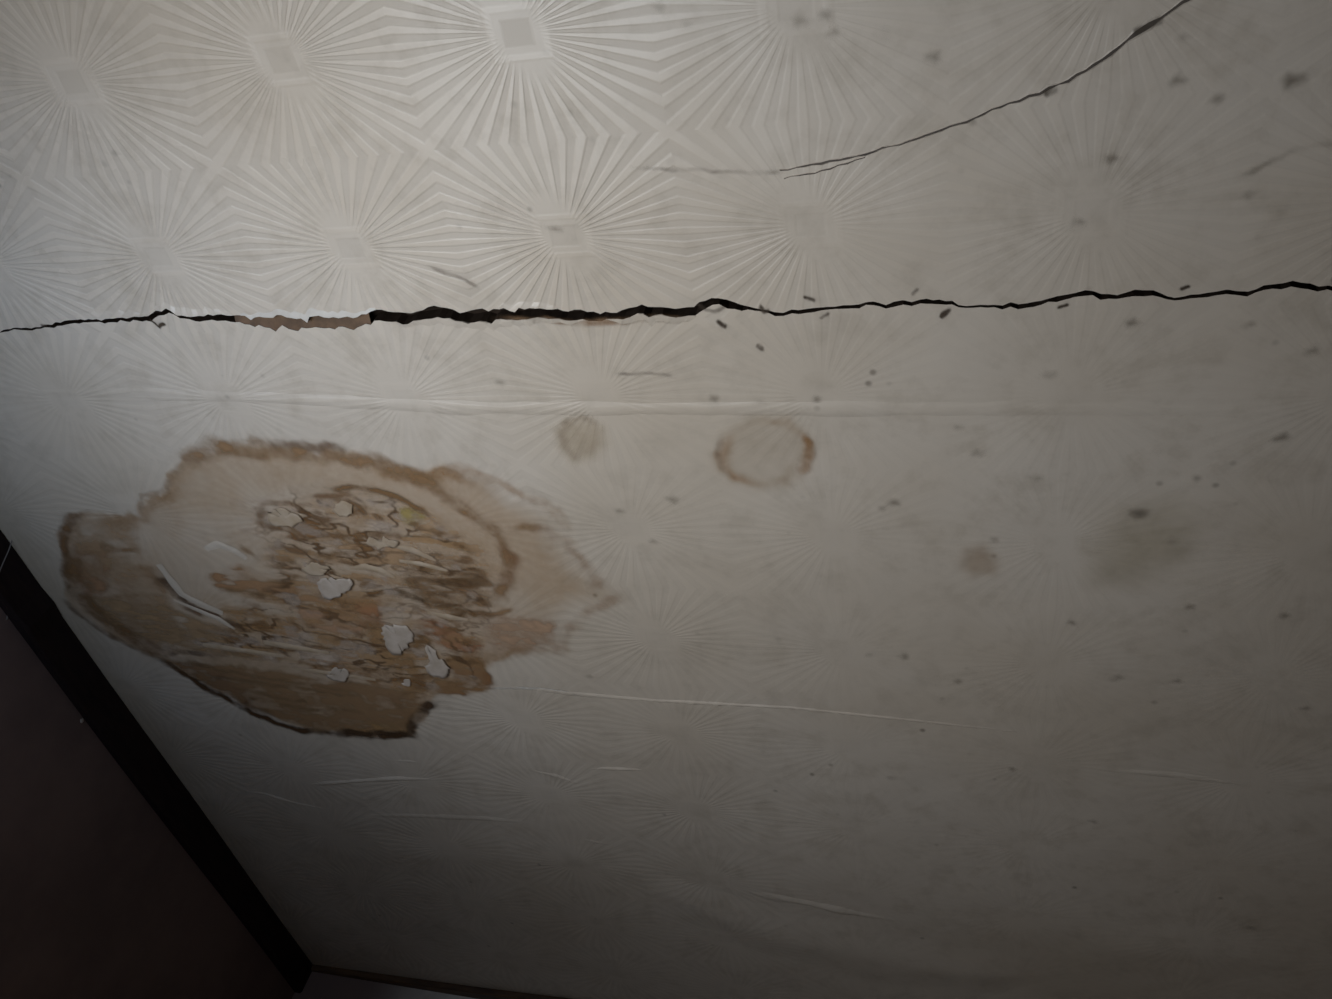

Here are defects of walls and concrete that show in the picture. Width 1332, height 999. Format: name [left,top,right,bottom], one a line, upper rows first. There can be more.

crack [779,0,1193,179]
crack [0,281,1332,333]
water stain [60,441,554,739]